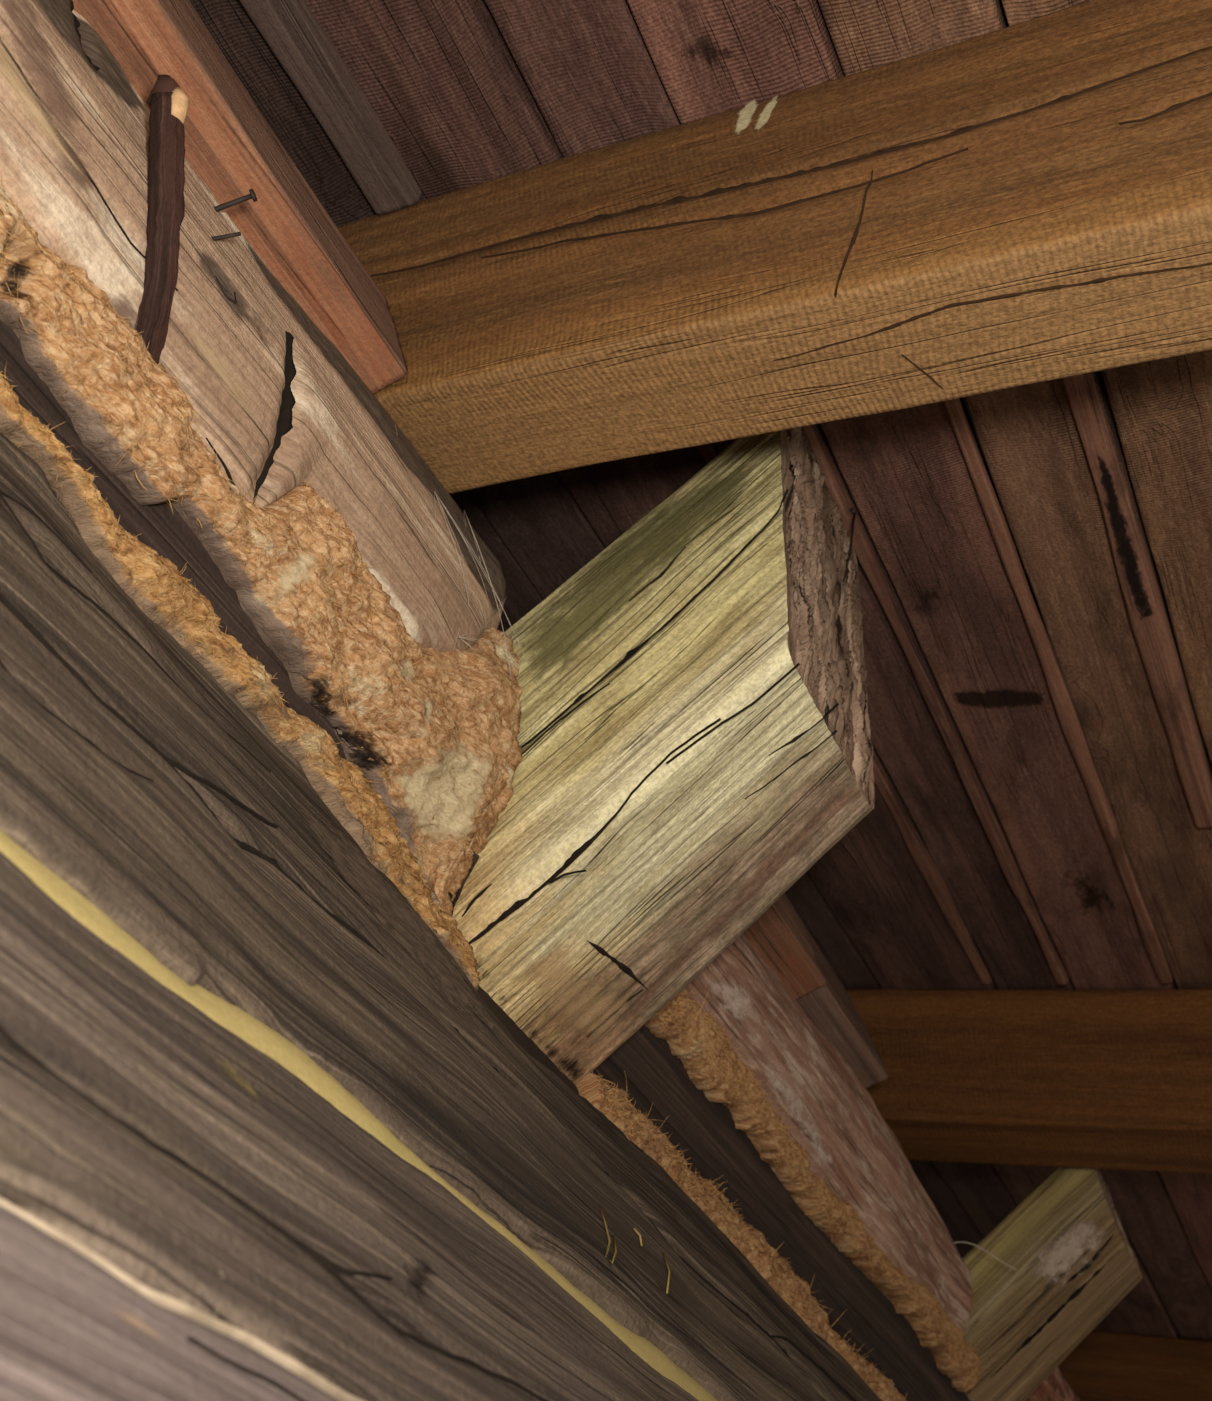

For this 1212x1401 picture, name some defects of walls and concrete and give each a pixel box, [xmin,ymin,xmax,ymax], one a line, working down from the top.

crack [370,46,1212,296]
crack [773,263,1212,389]
crack [521,489,788,755]
crack [0,593,387,960]
crack [462,663,800,944]
crack [744,703,839,799]
crack [0,1025,548,1401]
crack [647,1217,856,1401]
water stain [1031,1220,1104,1283]